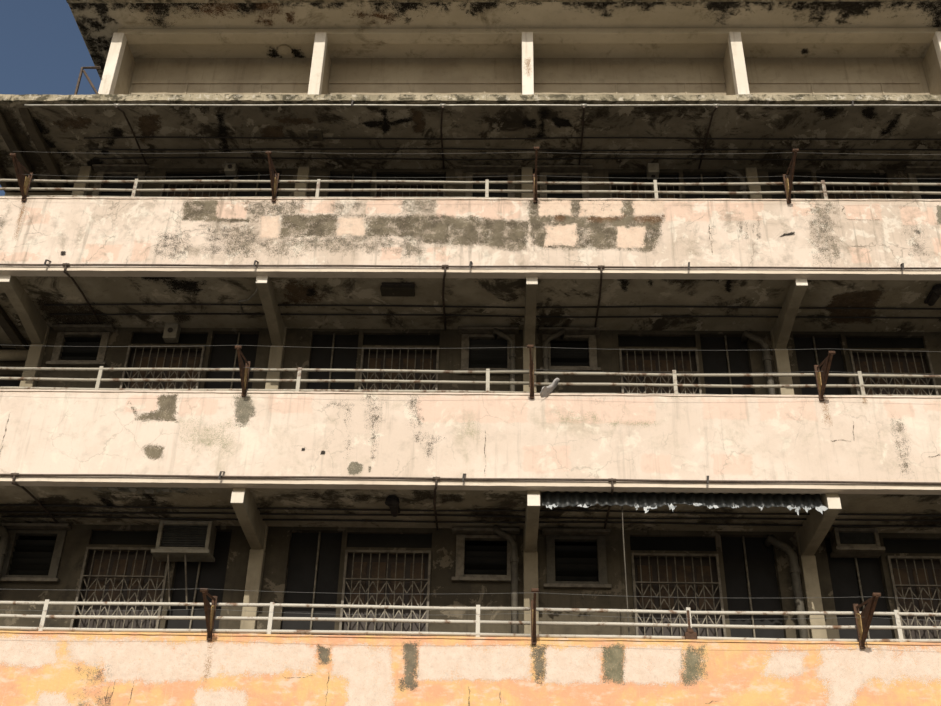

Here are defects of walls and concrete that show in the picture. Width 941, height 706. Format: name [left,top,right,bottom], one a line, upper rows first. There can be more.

water stain [279,2,542,24]
water stain [560,1,941,27]
water stain [68,3,216,76]
water stain [637,106,673,117]
water stain [817,104,838,120]
water stain [859,106,901,136]
water stain [806,201,842,267]
water stain [130,393,257,456]
water stain [398,640,420,692]
water stain [601,642,626,685]
water stain [679,643,709,689]
peeling [812,644,941,706]